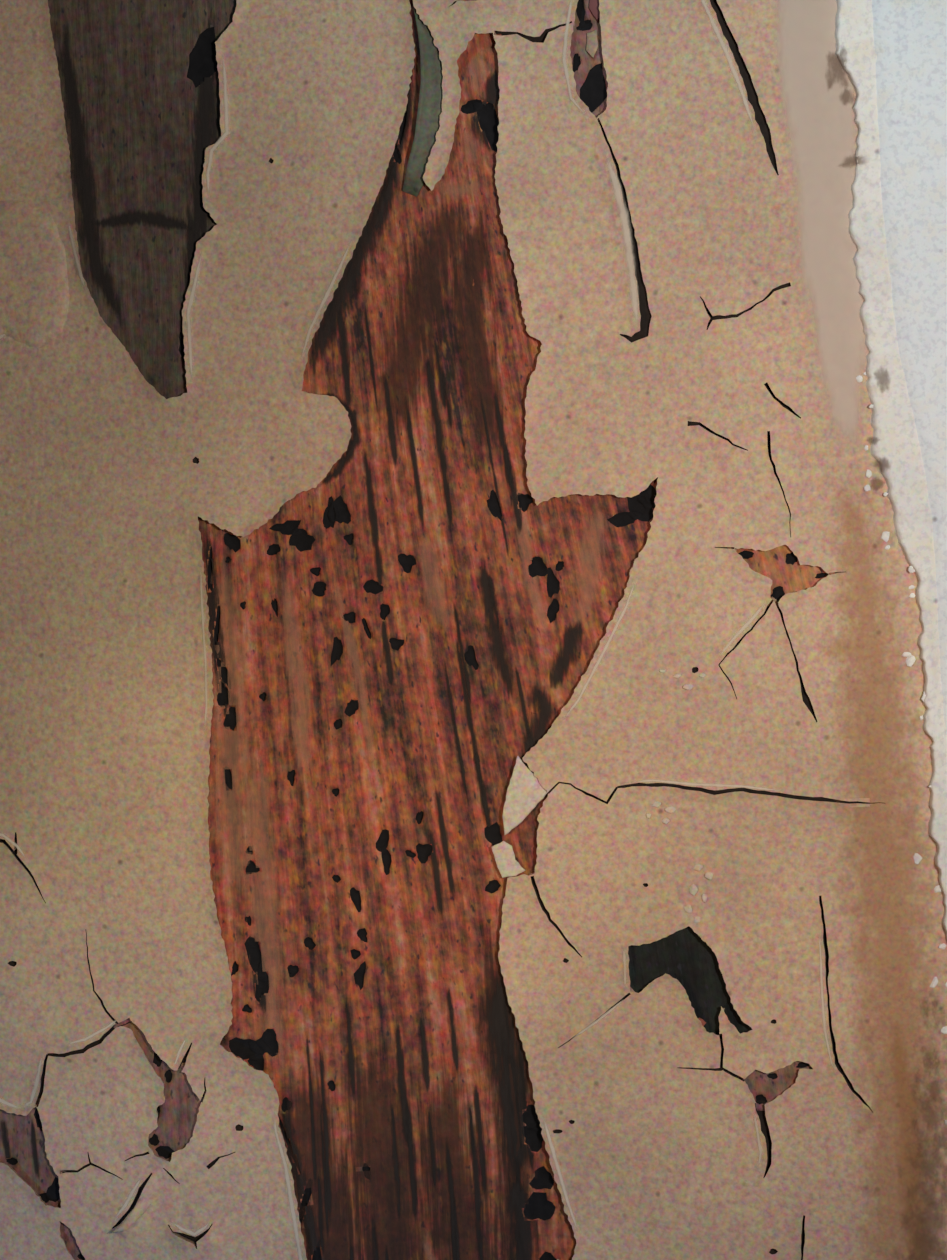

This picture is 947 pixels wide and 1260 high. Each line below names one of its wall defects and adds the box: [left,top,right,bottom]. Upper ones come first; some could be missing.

crack [702,0,779,175]
peeling [48,0,237,399]
crack [600,122,652,343]
peeling [198,0,658,1260]
peeling [727,545,835,609]
crack [553,780,885,804]
crack [26,932,132,1105]
peeling [113,1018,206,1161]
crack [531,876,582,957]
peeling [623,864,753,1035]
peeling [0,1096,85,1260]
crack [62,1152,180,1232]